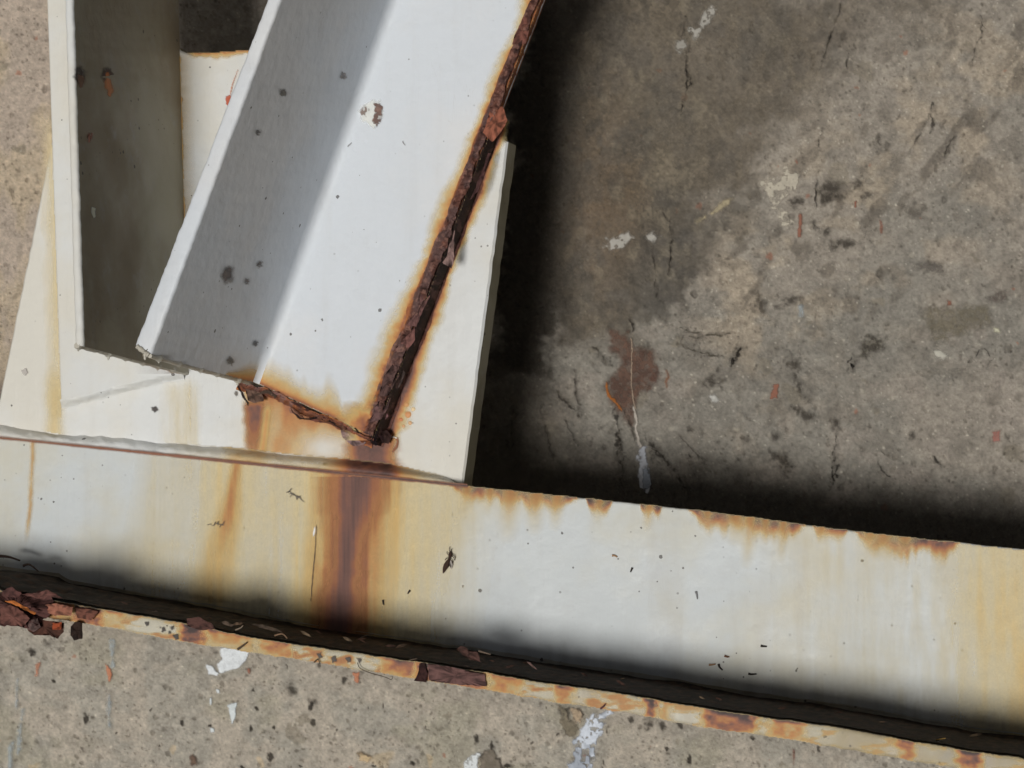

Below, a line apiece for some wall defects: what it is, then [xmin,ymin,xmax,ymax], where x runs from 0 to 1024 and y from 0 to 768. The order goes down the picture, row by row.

corrosion [74,67,85,88]
water stain [472,0,1024,549]
corrosion [143,0,577,704]
corrosion [605,330,669,426]
corrosion [452,486,612,513]
corrosion [689,510,959,558]
peeling [0,587,98,645]
corrosion [48,601,143,629]
corrosion [961,546,1024,736]
corrosion [586,693,835,744]
corrosion [863,738,925,761]
corrosion [939,747,984,768]